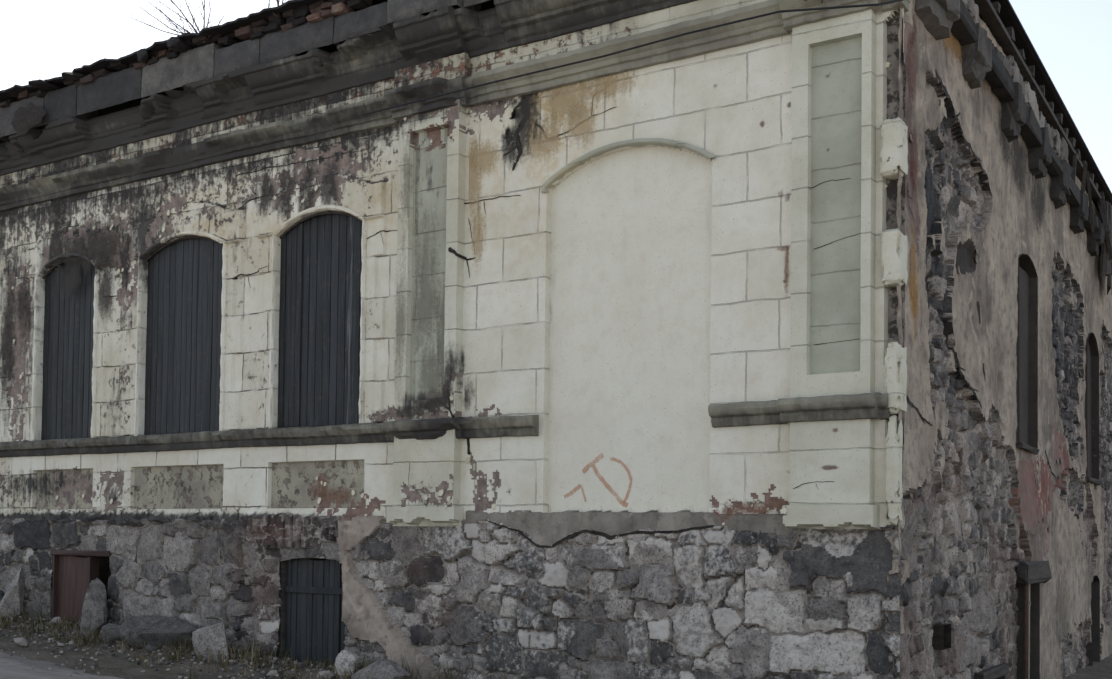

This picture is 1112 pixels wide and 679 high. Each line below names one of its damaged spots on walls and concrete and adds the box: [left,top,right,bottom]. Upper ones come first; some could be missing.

spalling [992,43,1068,163]
damp [469,76,627,205]
flaking render [955,238,978,276]
peeling [5,195,187,442]
damp [397,393,450,418]
crack [908,397,933,426]
spalling [240,473,386,550]
peeling [401,474,453,509]
peeling [465,453,501,514]
spalling [932,623,951,650]